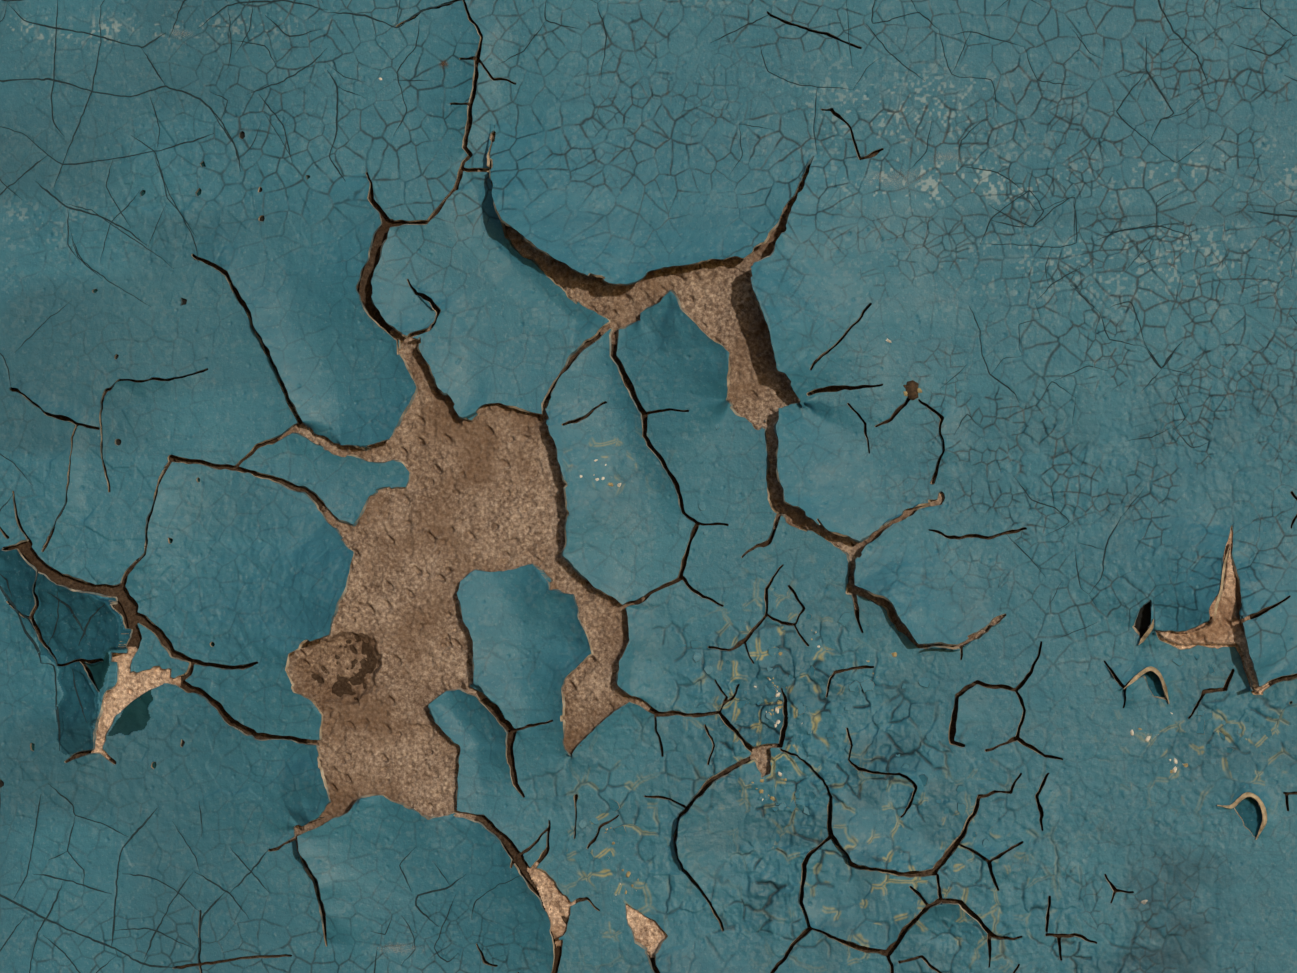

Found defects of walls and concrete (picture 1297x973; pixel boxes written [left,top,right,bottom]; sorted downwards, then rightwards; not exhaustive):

crack [711,0,1211,479]
crack [0,785,327,973]
crack [0,0,607,764]
crack [371,794,619,973]
crack [461,683,549,797]
peeling [0,103,1028,973]
crack [538,331,729,607]
crack [646,477,1143,973]
peeling [1124,526,1297,764]
crack [1189,669,1234,718]
spalling [1217,792,1267,840]
crack [1250,596,1289,619]